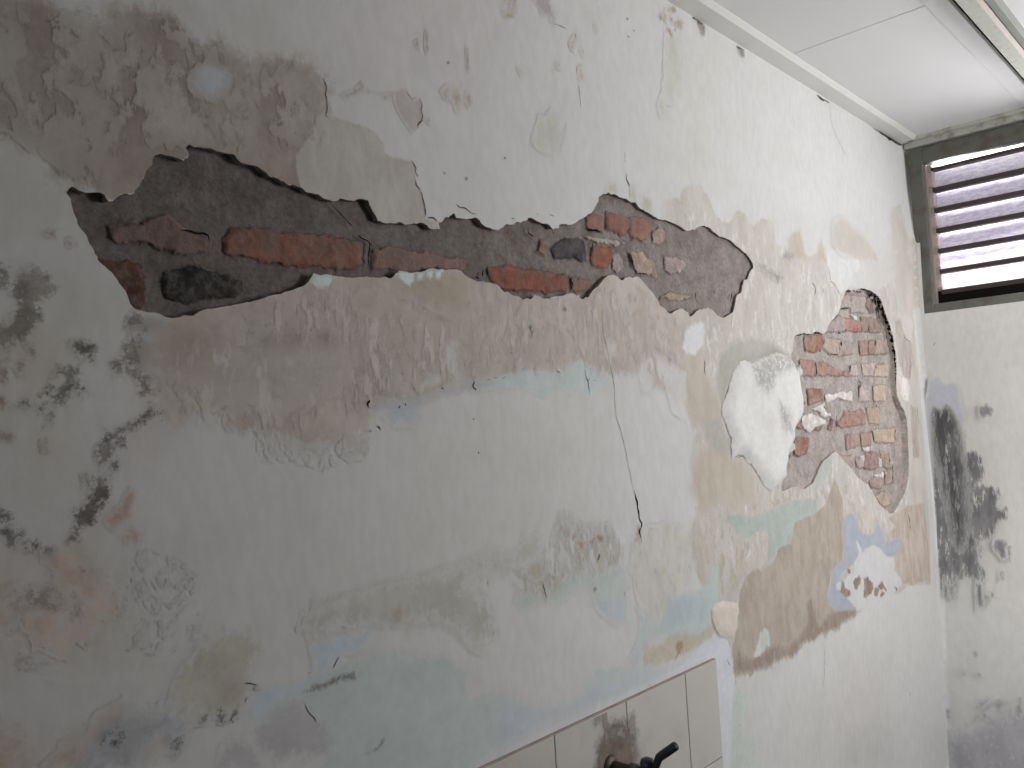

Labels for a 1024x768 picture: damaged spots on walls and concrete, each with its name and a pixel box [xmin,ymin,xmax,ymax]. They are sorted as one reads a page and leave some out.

leakage [0,0,327,190]
leakage [0,256,62,353]
flaking render [0,0,931,659]
leakage [0,308,499,642]
leakage [910,402,1014,610]